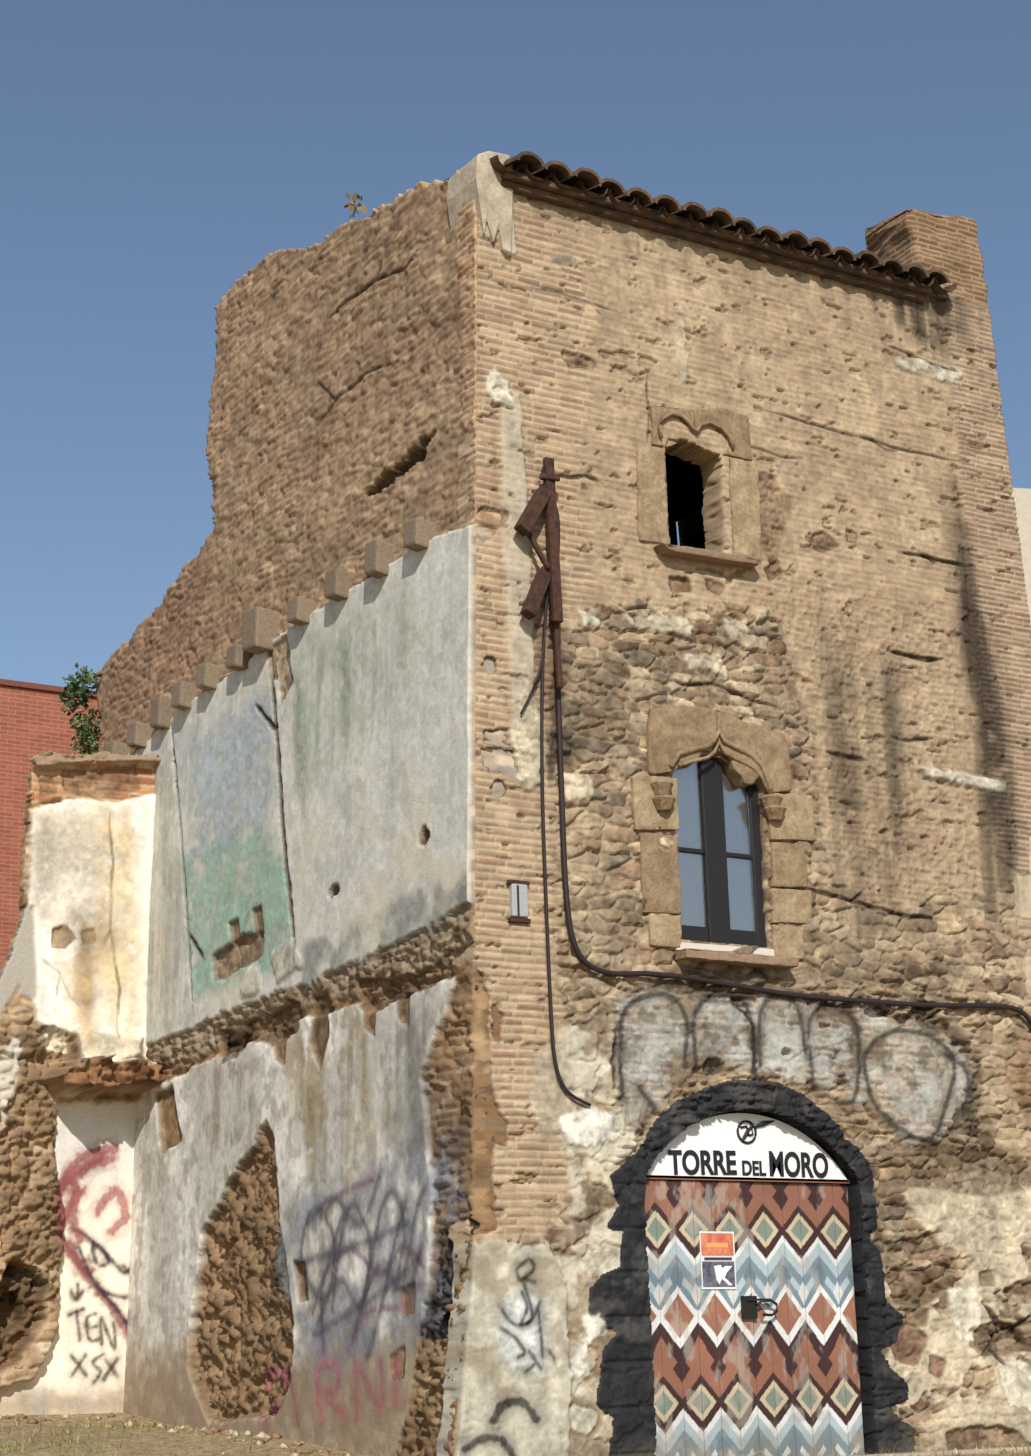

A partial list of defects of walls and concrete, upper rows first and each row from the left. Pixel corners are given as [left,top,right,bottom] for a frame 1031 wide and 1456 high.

crack [331,261,412,318]
crack [321,363,390,421]
crack [773,412,945,460]
spalling [51,926,95,948]
spalling [214,906,265,997]
spalling [357,942,477,1035]
spalling [222,991,334,1068]
hole [0,1263,43,1369]